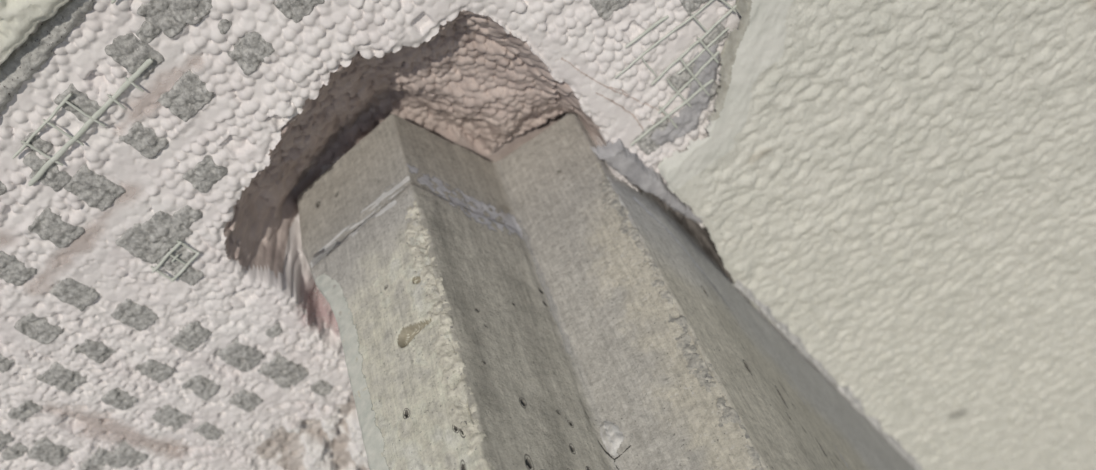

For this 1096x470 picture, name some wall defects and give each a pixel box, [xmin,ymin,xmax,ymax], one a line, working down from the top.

spalling [223,10,606,279]
spalling [707,0,752,121]
spalling [256,274,389,470]
spalling [397,197,495,470]
spalling [596,163,768,470]